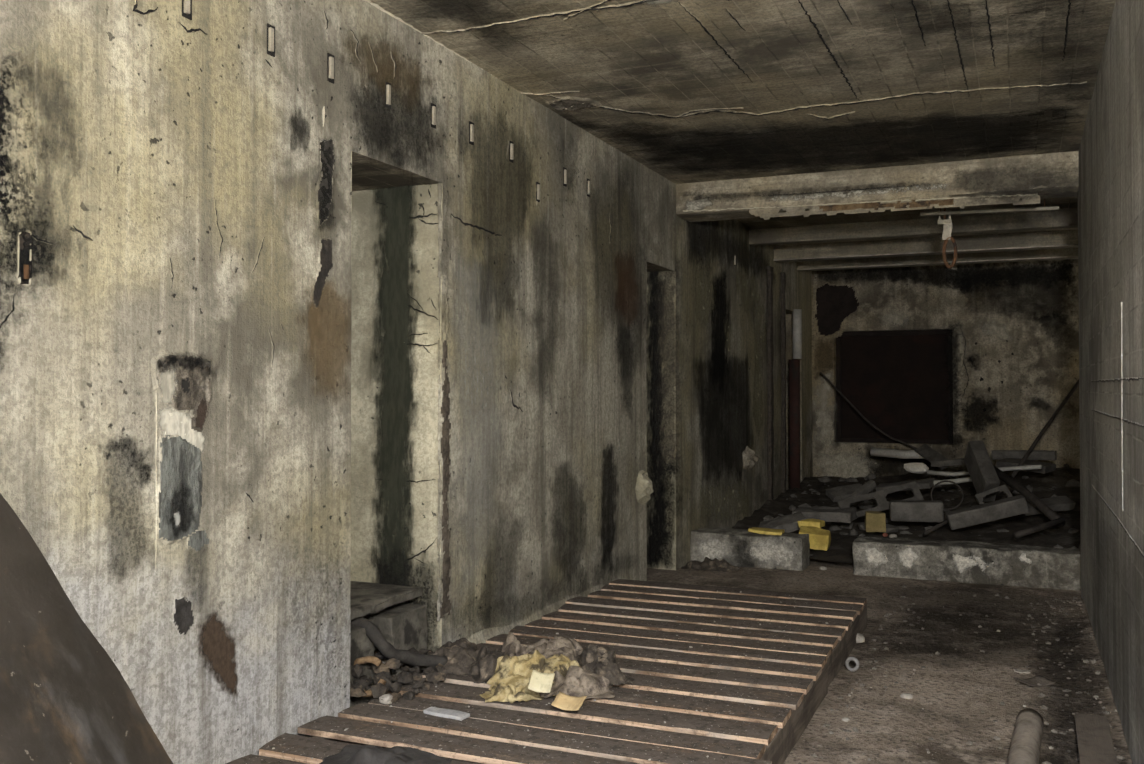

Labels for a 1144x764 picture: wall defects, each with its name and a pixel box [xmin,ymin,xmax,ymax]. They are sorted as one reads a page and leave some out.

crack [131,0,207,35]
crack [323,10,396,79]
crack [365,0,1087,120]
crack [1091,377,1144,428]
spalling [151,351,215,552]
corrosion [199,613,238,695]